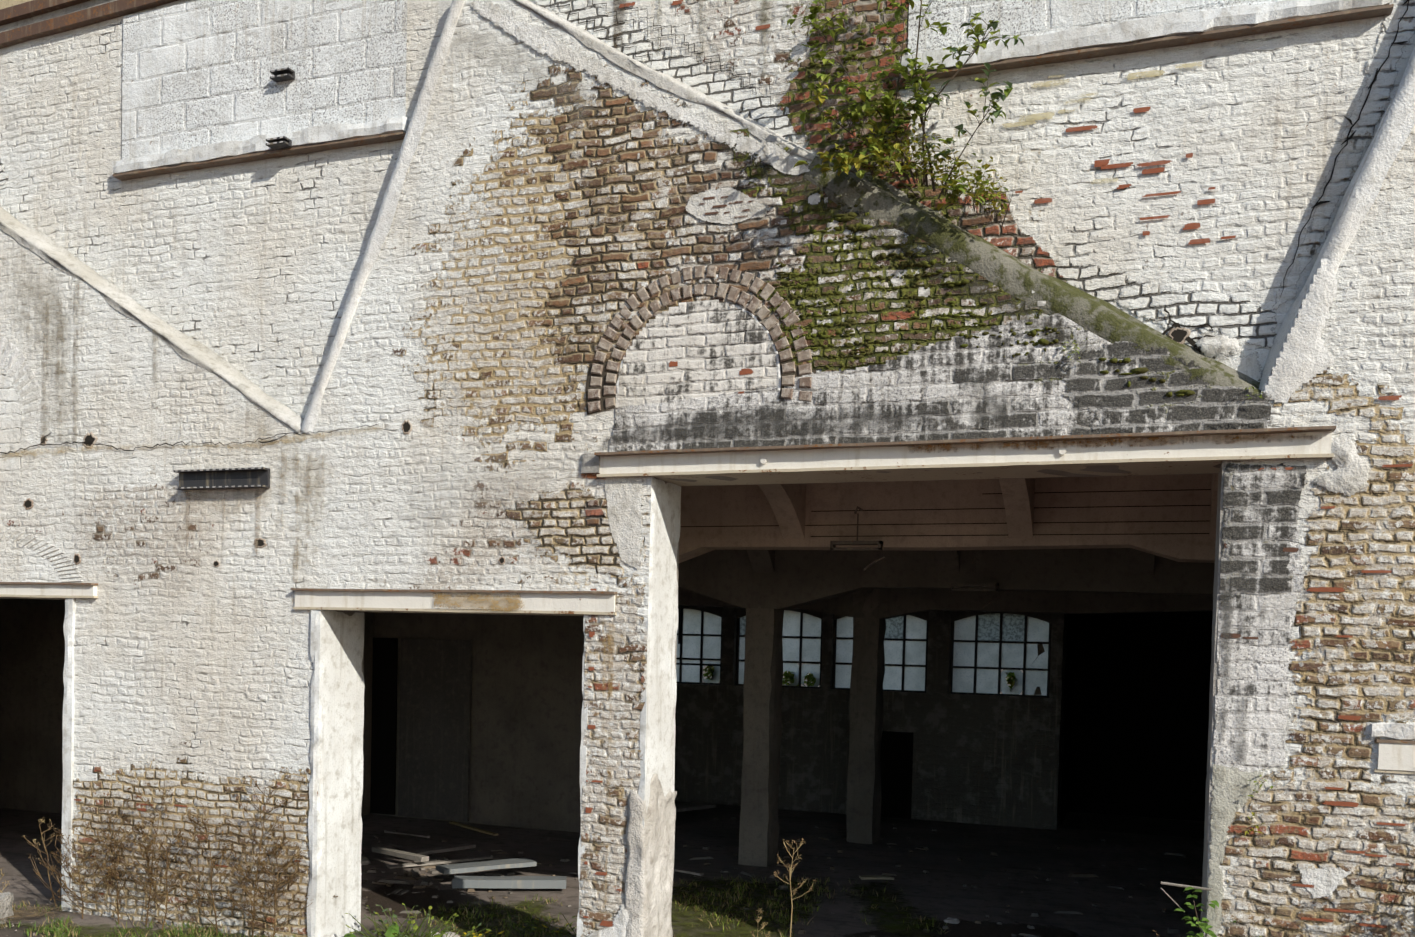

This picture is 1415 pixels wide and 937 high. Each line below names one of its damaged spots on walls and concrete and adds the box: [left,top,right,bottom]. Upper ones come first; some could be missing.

peeling [391,56,851,473]
leakage [721,142,955,278]
peeling [671,0,1067,282]
peeling [1094,153,1193,197]
crack [0,424,377,454]
leakage [603,404,949,449]
leakage [959,279,1271,434]
peeling [505,482,677,937]
leakage [1223,687,1249,758]
leakage [1219,463,1307,675]
peeling [1207,370,1415,937]
peeling [71,758,318,937]